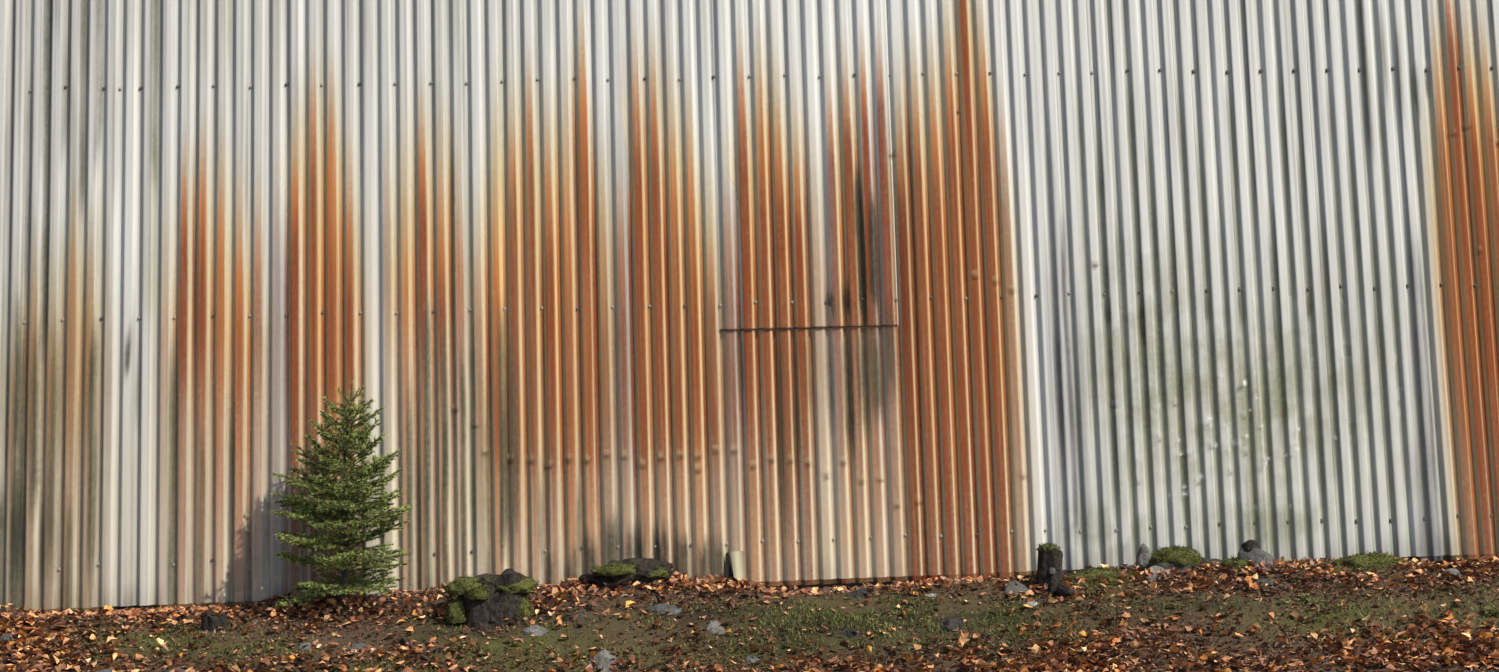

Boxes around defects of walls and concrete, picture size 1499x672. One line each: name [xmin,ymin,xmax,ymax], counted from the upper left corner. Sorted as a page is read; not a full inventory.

corrosion [175,170,262,498]
corrosion [285,106,363,597]
corrosion [393,130,463,446]
corrosion [483,54,813,576]
damp [827,290,850,315]
damp [845,334,892,434]
corrosion [828,0,1014,581]
corrosion [1435,0,1499,559]